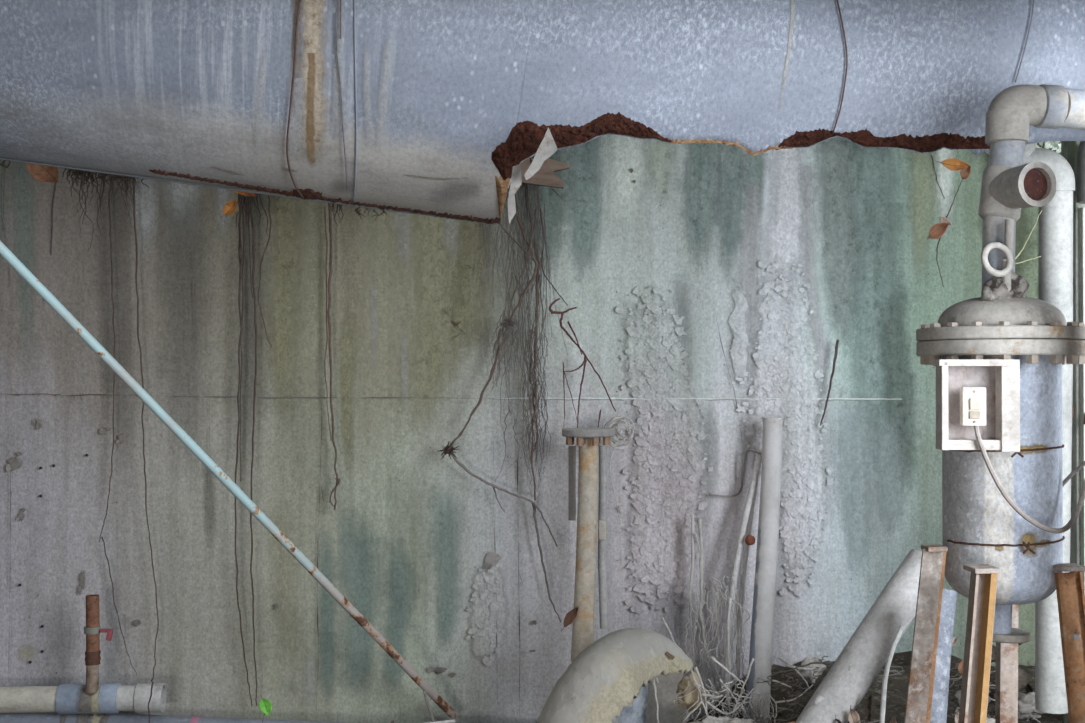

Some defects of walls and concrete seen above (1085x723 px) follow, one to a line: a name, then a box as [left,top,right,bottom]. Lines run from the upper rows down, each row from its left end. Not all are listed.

rust [293,188,322,199]
water stain [570,135,672,261]
water stain [936,148,953,218]
water stain [717,137,856,386]